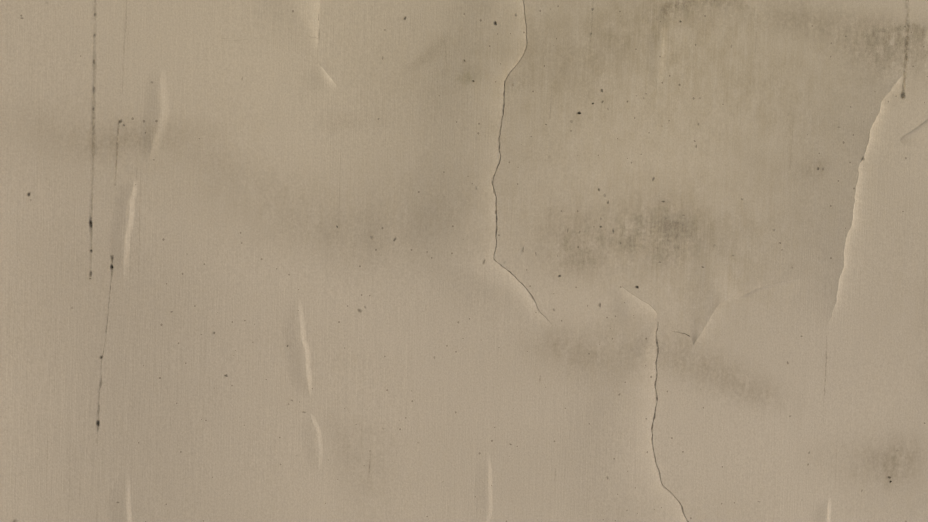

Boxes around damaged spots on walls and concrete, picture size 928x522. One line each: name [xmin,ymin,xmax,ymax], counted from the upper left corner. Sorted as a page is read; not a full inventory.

crack [404,0,552,334]
crack [559,285,701,522]